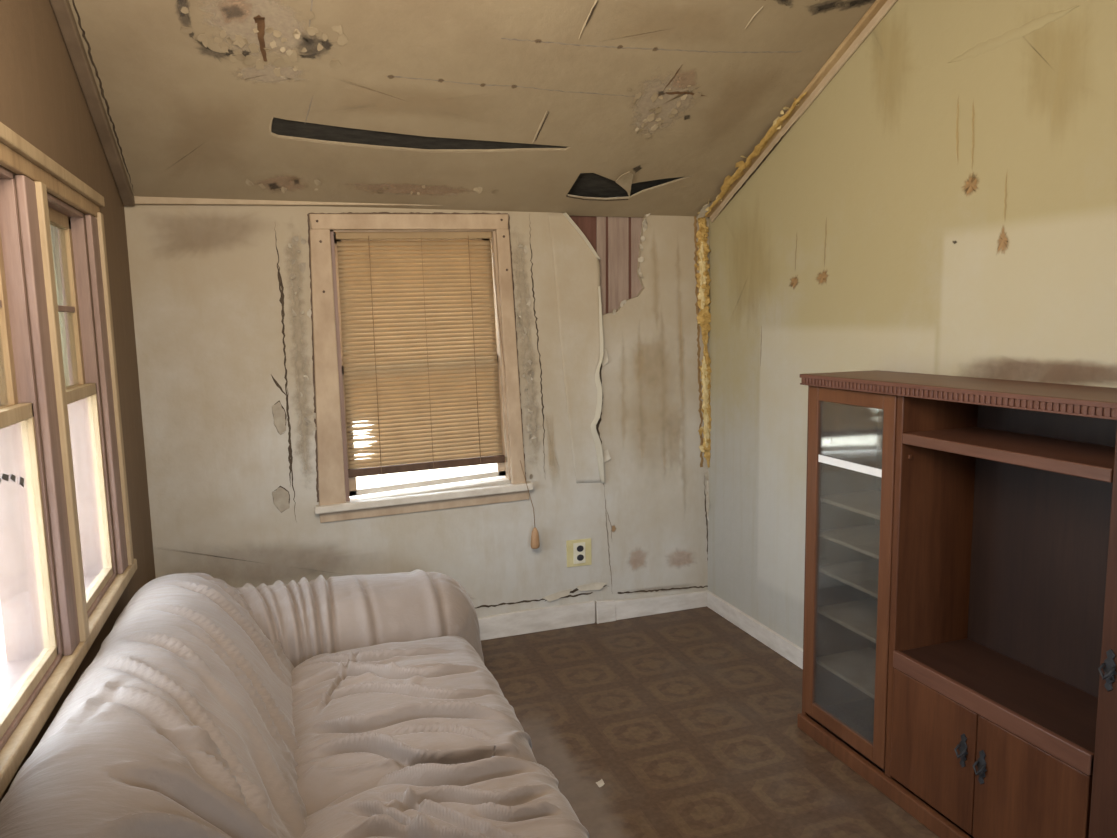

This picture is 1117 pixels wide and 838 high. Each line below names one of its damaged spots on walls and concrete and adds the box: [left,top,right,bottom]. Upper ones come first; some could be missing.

peeling [177,0,348,82]
damp [964,176,977,194]
damp [998,227,1008,251]
flaking render [515,214,545,479]